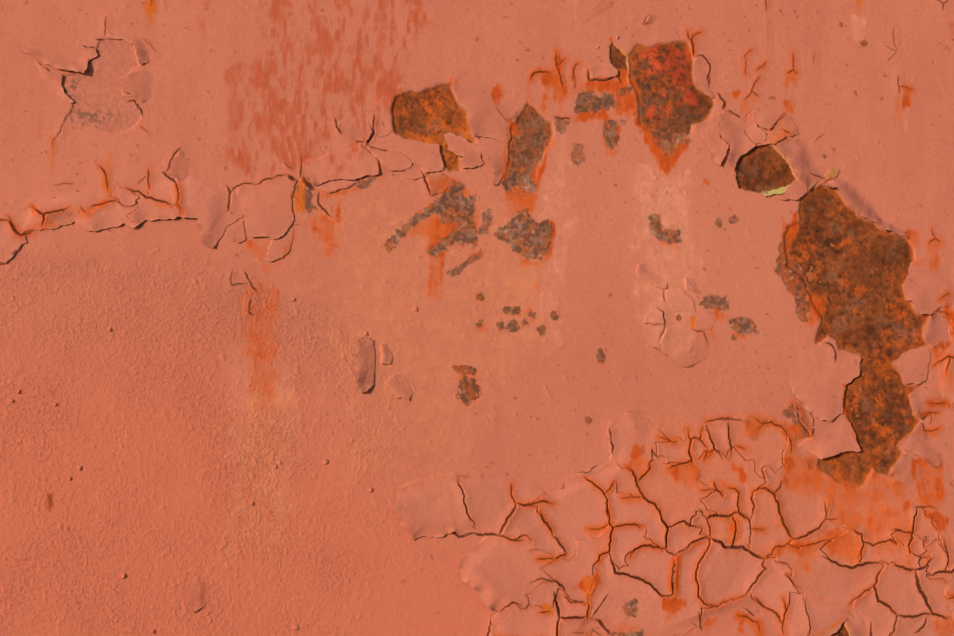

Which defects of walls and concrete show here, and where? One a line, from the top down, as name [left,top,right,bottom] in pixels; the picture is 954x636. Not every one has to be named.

peeling [16,8,163,144]
peeling [215,0,557,209]
rust [490,81,512,128]
crack [0,86,462,294]
rust [384,181,558,305]
rust [474,293,559,336]
peeling [637,264,760,367]
peeling [735,137,954,486]
rust [451,364,483,412]
crack [395,222,954,636]